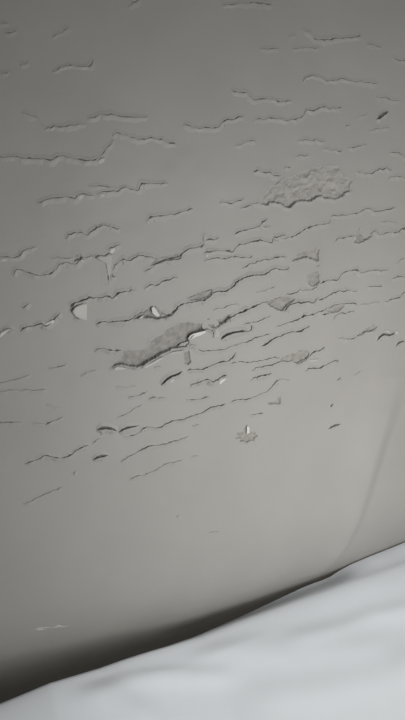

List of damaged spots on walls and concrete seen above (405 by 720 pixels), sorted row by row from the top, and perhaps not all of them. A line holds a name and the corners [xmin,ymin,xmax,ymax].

crack [301,73,378,89]
crack [0,87,342,208]
spalling [258,161,357,214]
peeling [106,283,234,373]
crack [0,197,405,481]
peeling [263,291,300,316]